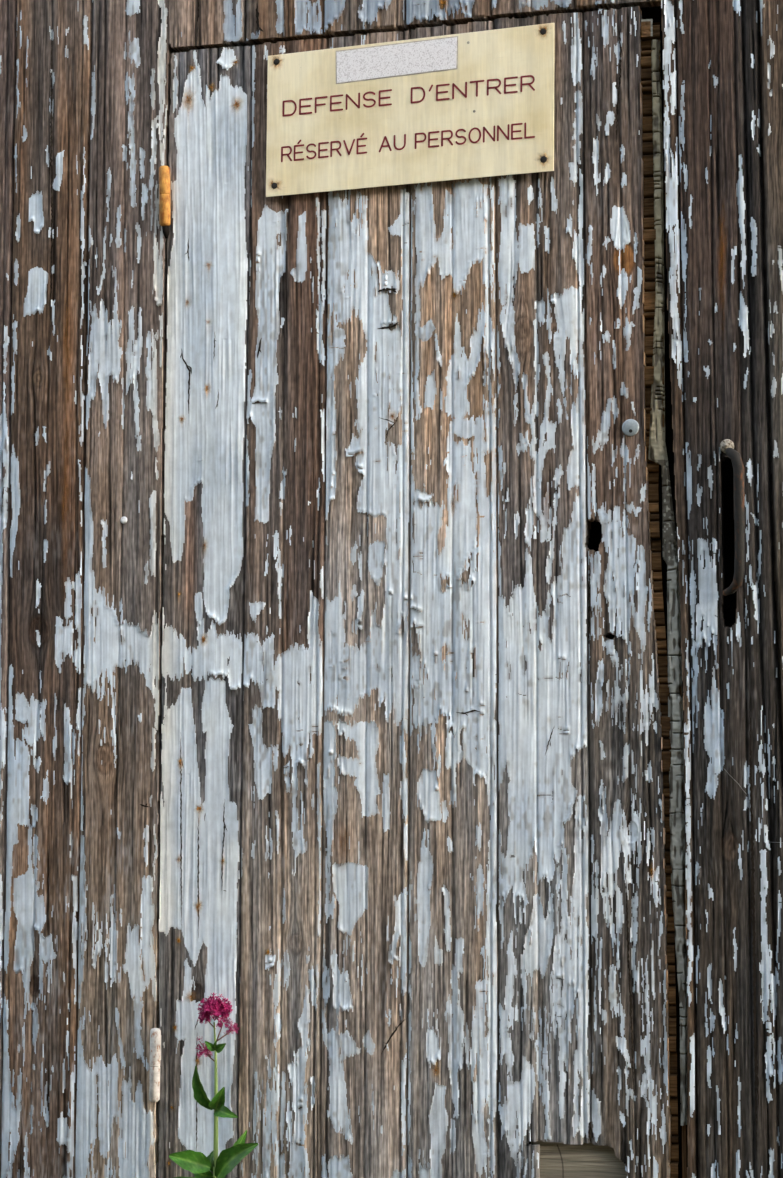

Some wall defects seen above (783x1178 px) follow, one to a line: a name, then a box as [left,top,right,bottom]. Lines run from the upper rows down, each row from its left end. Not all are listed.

peeling [14,10,29,159]
peeling [15,145,65,242]
peeling [49,26,69,58]
peeling [751,109,772,157]
peeling [756,0,783,97]
peeling [6,259,19,286]
peeling [23,265,58,342]
peeling [731,154,757,389]
peeling [768,246,783,398]
peeling [55,0,668,1178]
peeling [0,314,57,1178]
peeling [677,442,783,1178]